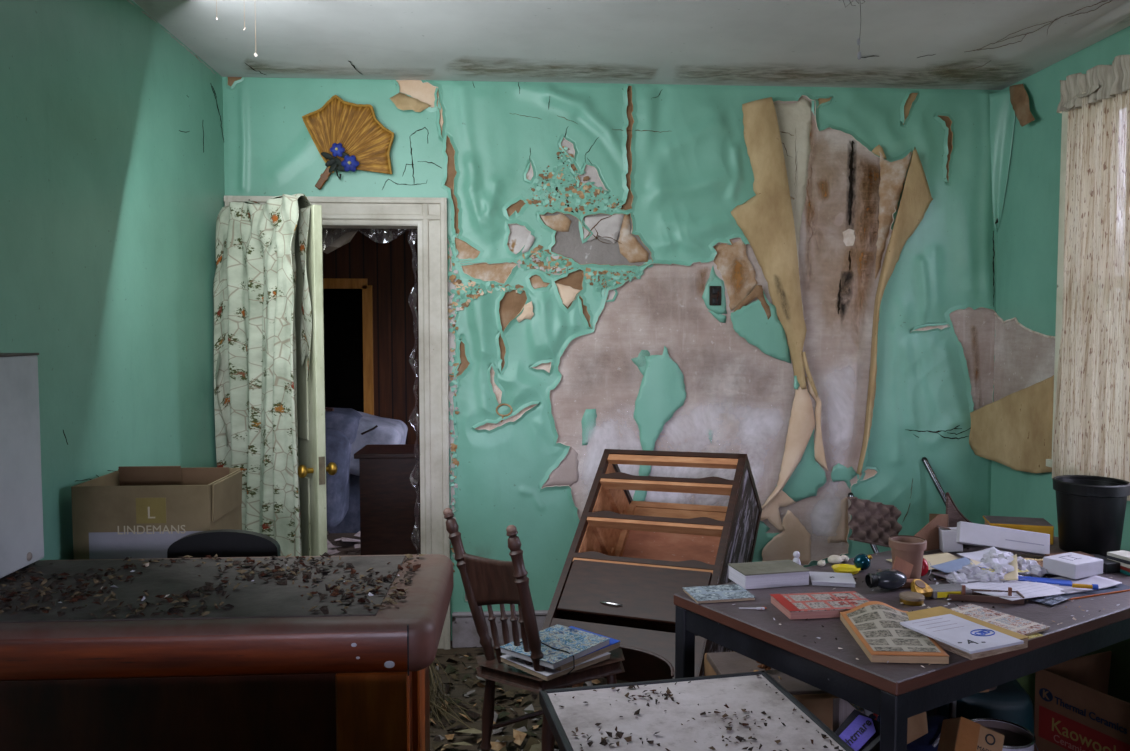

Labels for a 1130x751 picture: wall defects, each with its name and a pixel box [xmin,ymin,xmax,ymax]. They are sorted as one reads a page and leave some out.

crack [966,0,1112,69]
peeling [1009,84,1035,127]
crack [382,127,441,190]
damp [847,142,856,223]
flaking render [938,116,952,180]
peeling [389,80,933,567]
damp [838,272,852,314]
peeling [917,303,1055,473]